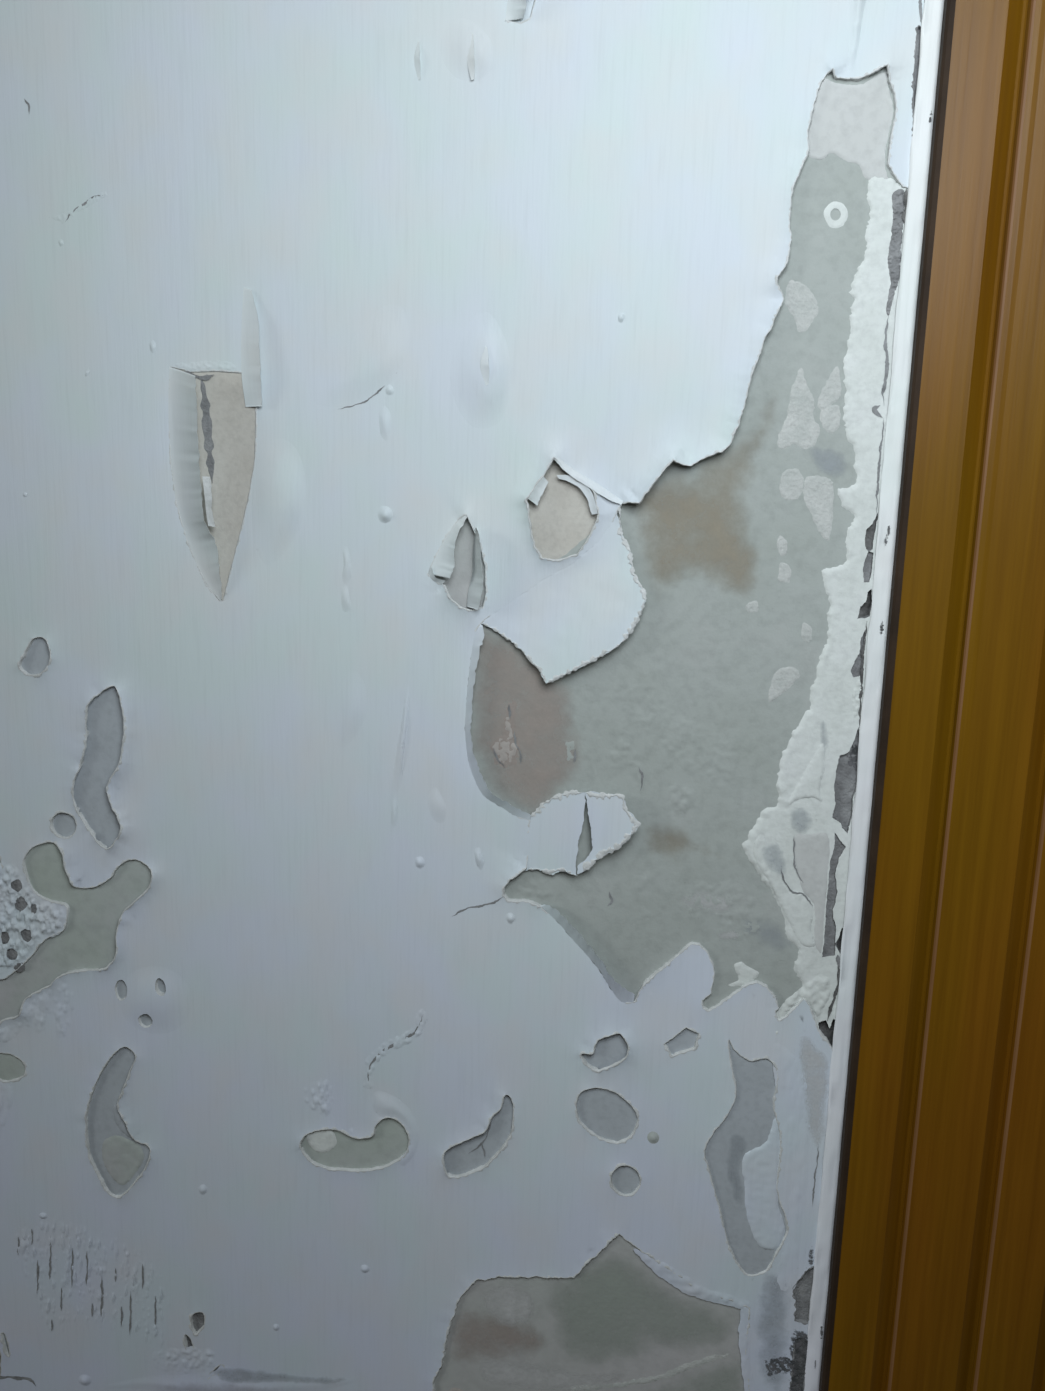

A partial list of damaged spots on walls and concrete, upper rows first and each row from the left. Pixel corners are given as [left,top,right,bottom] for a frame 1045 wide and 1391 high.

peeling [464,63,908,1051]
peeling [17,636,52,678]
peeling [0,685,153,1131]
peeling [84,1046,151,1199]
peeling [299,1091,420,1173]
peeling [441,1094,515,1179]
peeling [574,1031,640,1145]
peeling [609,1163,642,1197]
peeling [703,1040,789,1277]
peeling [432,1233,755,1391]